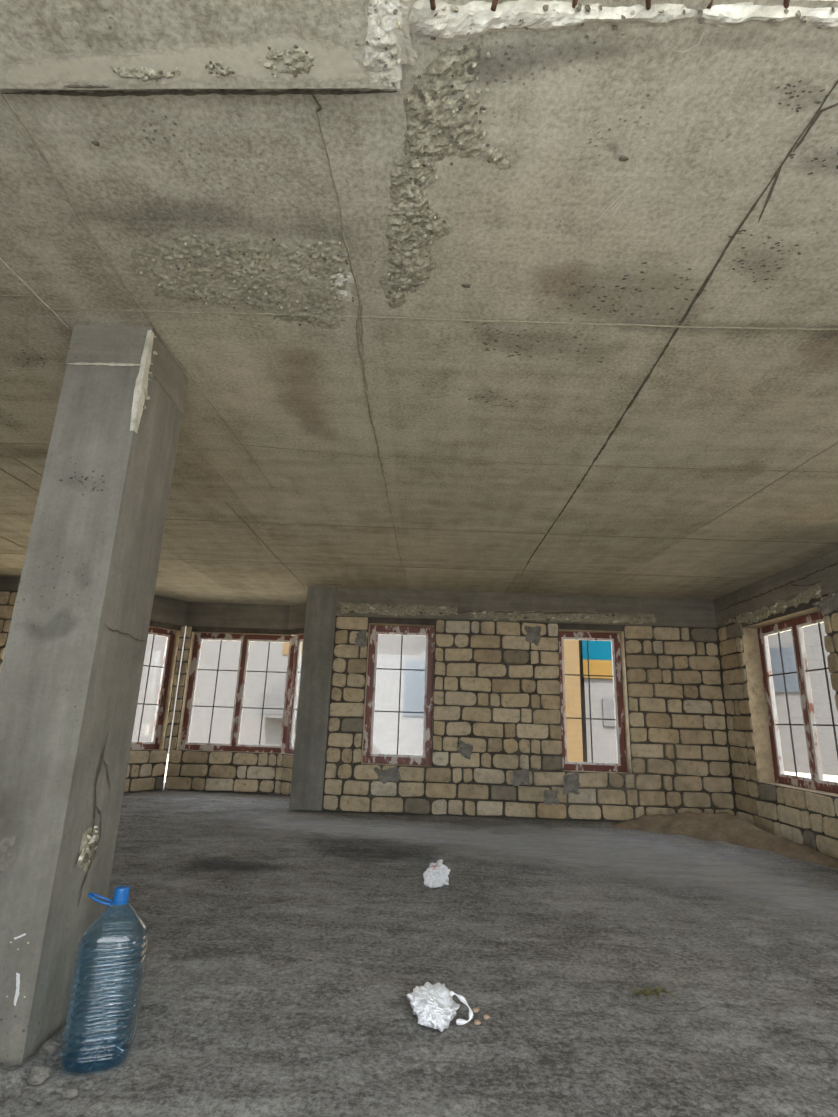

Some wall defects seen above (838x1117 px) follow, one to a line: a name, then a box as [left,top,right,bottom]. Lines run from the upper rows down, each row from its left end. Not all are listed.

spalling [130,330,158,433]
crack [0,85,404,583]
spalling [362,0,838,163]
crack [522,80,838,574]